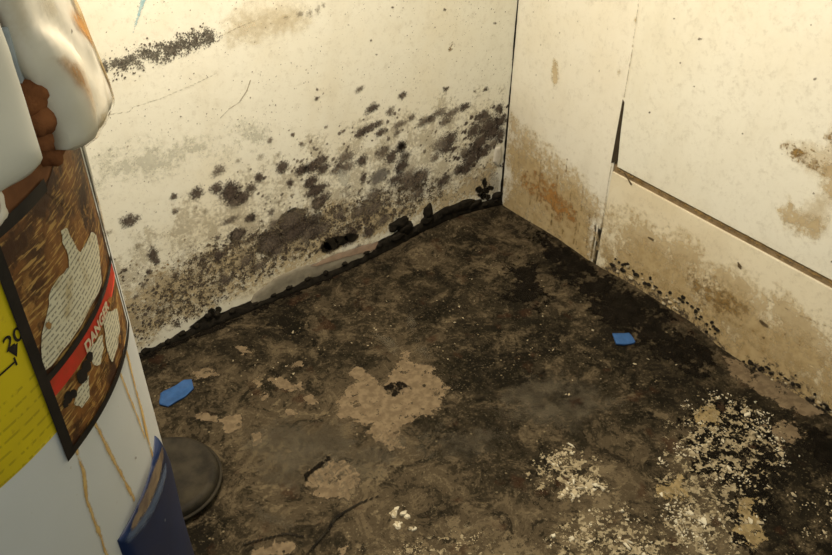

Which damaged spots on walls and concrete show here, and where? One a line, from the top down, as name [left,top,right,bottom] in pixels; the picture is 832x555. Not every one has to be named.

damp [66,62,90,93]
damp [71,0,220,98]
damp [785,133,832,197]
damp [118,102,508,349]
damp [778,203,820,236]
damp [500,211,832,416]
damp [796,427,832,472]